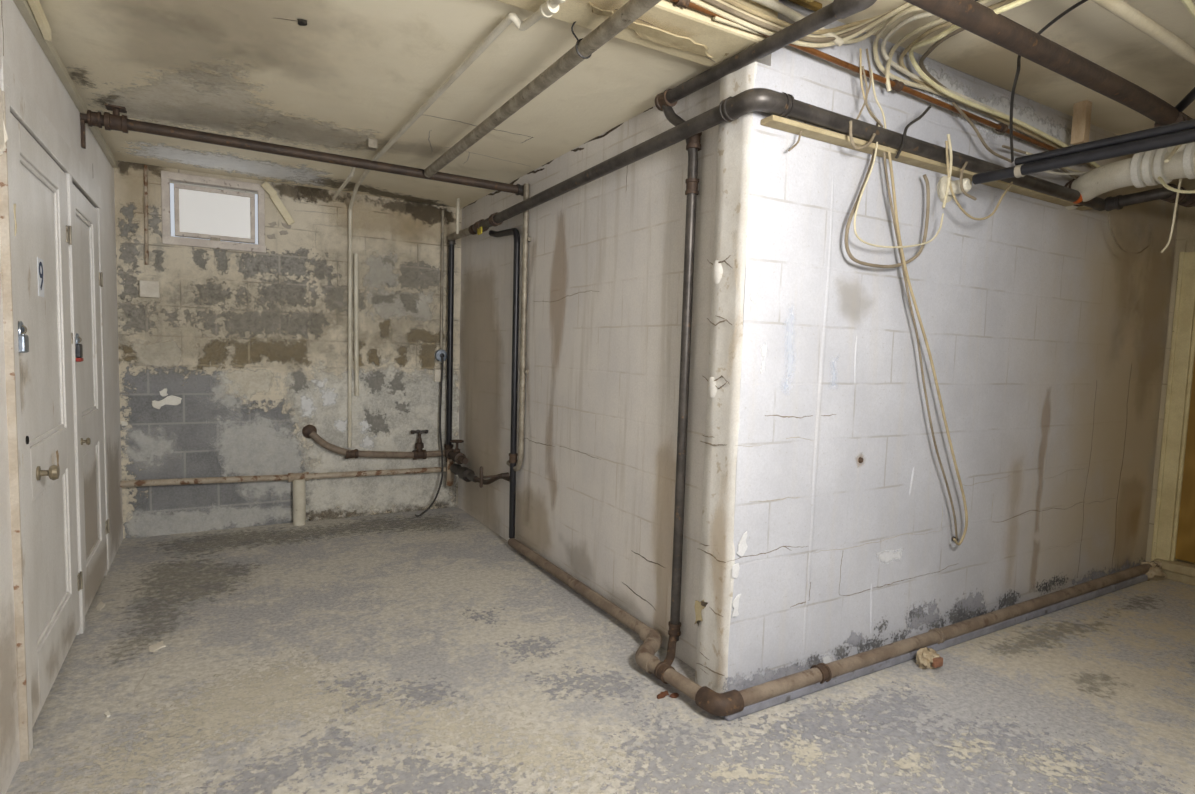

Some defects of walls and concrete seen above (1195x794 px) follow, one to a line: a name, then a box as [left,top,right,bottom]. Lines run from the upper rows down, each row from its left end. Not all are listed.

damp [70,68,120,105]
peeling [116,204,445,539]
damp [786,589,1020,675]